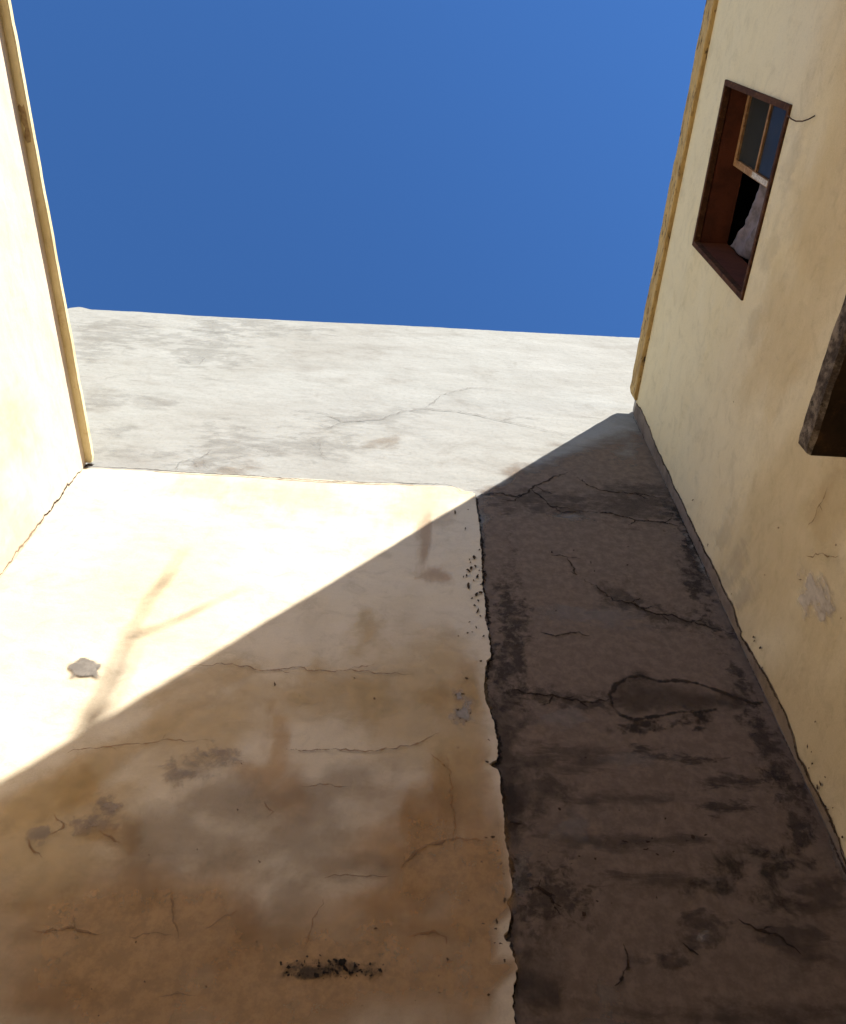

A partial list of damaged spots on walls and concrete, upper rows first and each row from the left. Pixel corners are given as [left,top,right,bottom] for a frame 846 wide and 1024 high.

crack [0,441,371,575]
spalling [68,658,101,678]
crack [196,663,407,675]
leakage [21,431,846,1024]
crack [291,405,846,1023]